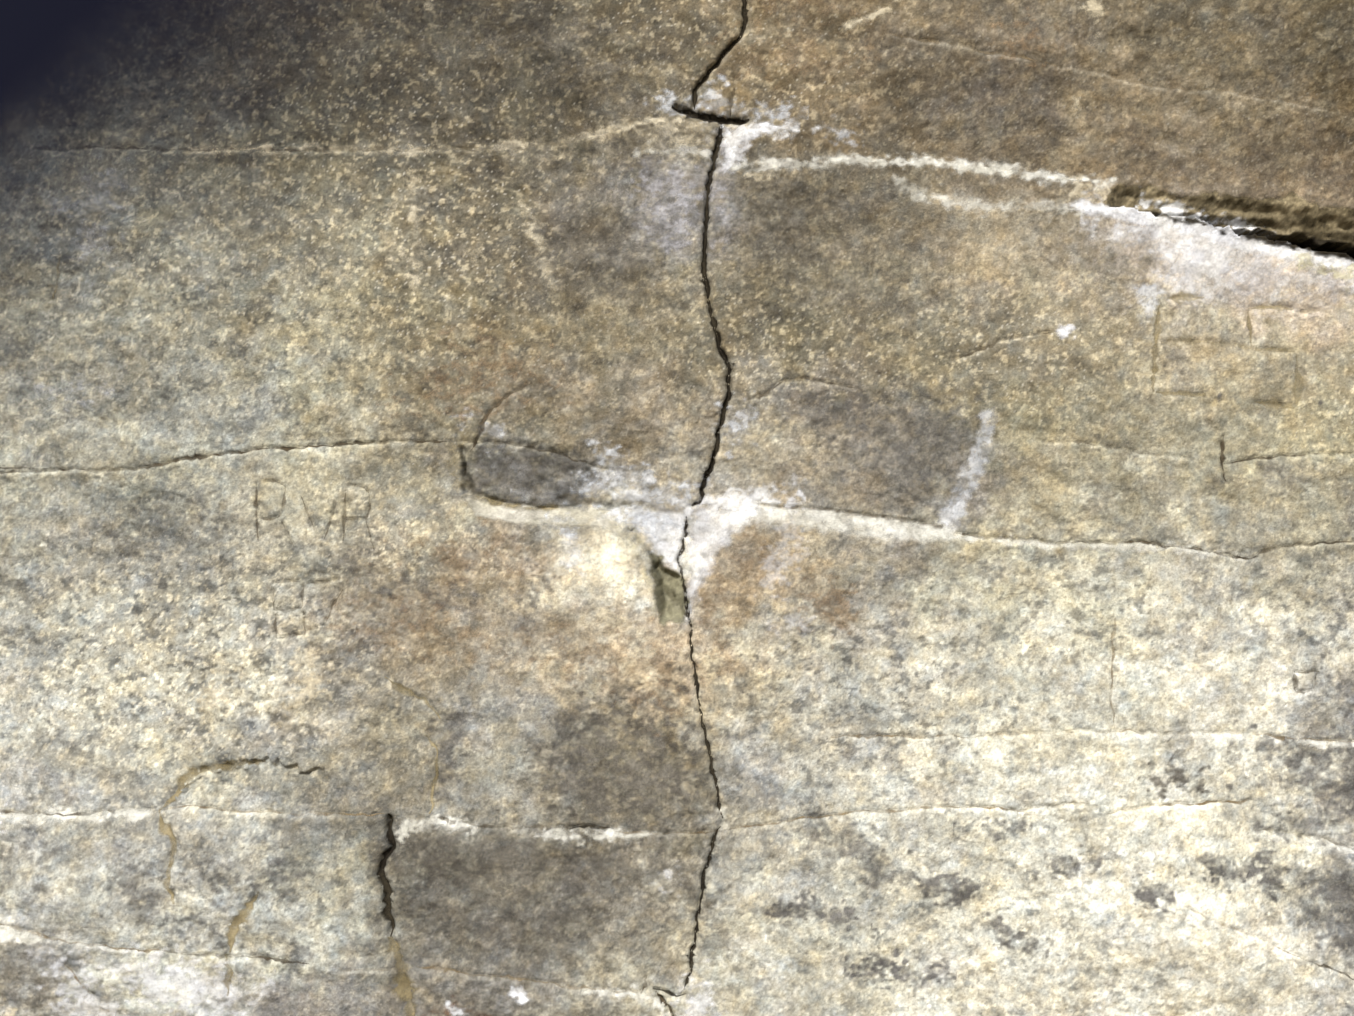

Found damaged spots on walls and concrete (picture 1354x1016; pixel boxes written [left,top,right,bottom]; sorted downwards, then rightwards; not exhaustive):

crack [148,440,370,468]
crack [642,0,852,1016]
crack [385,677,441,814]
crack [570,823,614,831]
crack [1163,800,1258,831]
crack [325,813,461,1016]